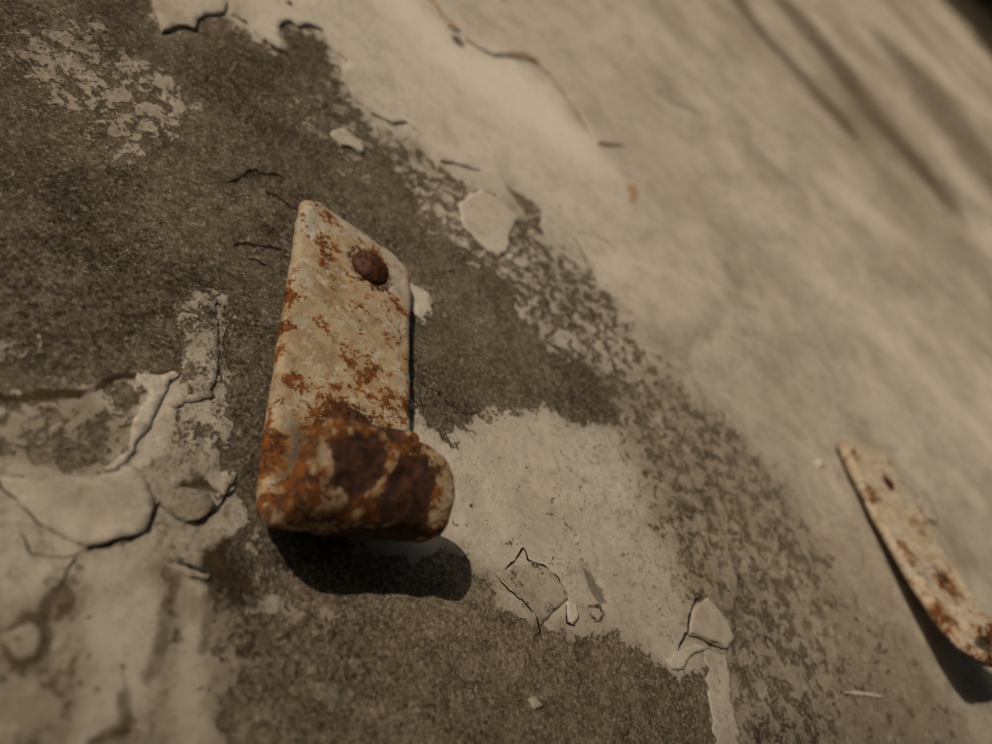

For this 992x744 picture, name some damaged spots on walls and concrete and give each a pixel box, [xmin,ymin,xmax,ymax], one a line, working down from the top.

peeling [151,0,482,172]
peeling [428,0,625,147]
spalling [233,241,281,266]
peeling [458,183,545,257]
spalling [0,296,238,547]
crack [0,474,161,589]
spalling [163,562,210,581]
peeling [496,547,579,635]
spalling [584,569,606,603]
peeling [666,596,742,744]